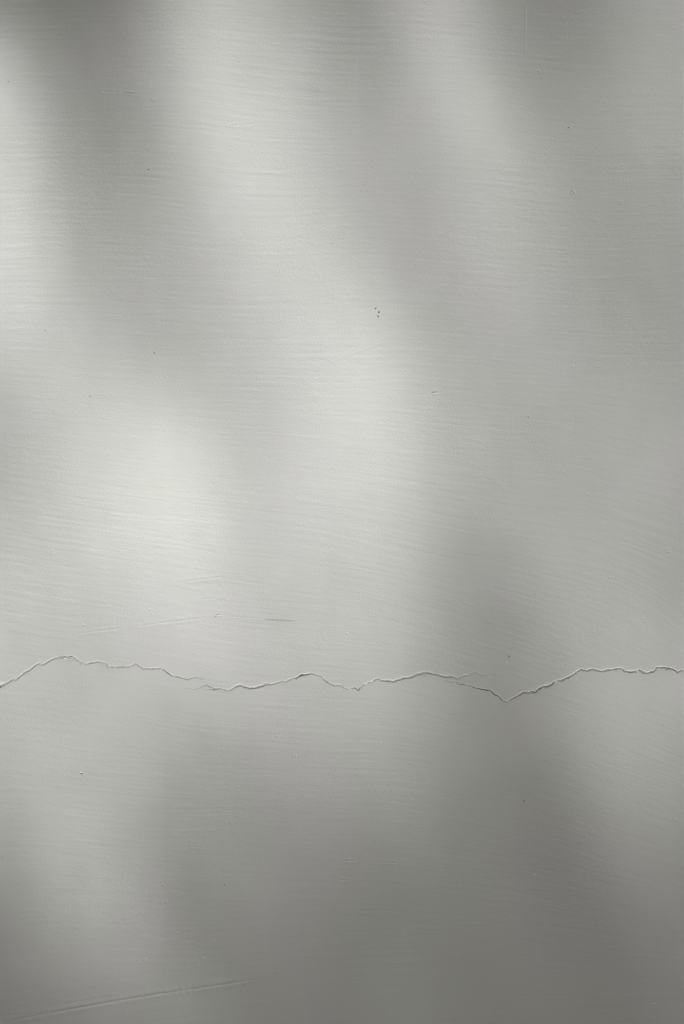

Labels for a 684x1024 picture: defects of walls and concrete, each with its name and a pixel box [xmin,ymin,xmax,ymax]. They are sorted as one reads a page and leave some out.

crack [0,655,684,703]